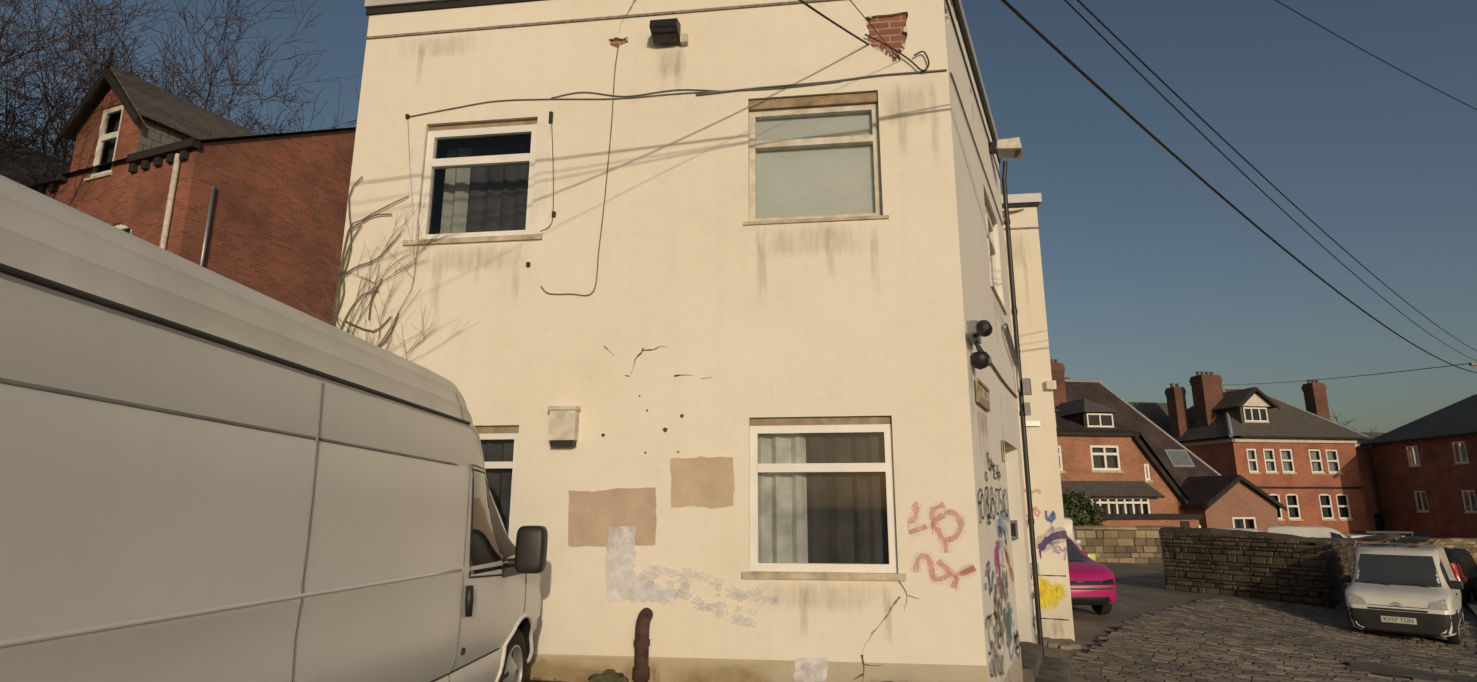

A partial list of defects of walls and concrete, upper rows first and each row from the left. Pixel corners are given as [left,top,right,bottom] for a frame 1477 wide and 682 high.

spalling [865,14,908,62]
crack [603,346,712,379]
crack [854,581,918,680]